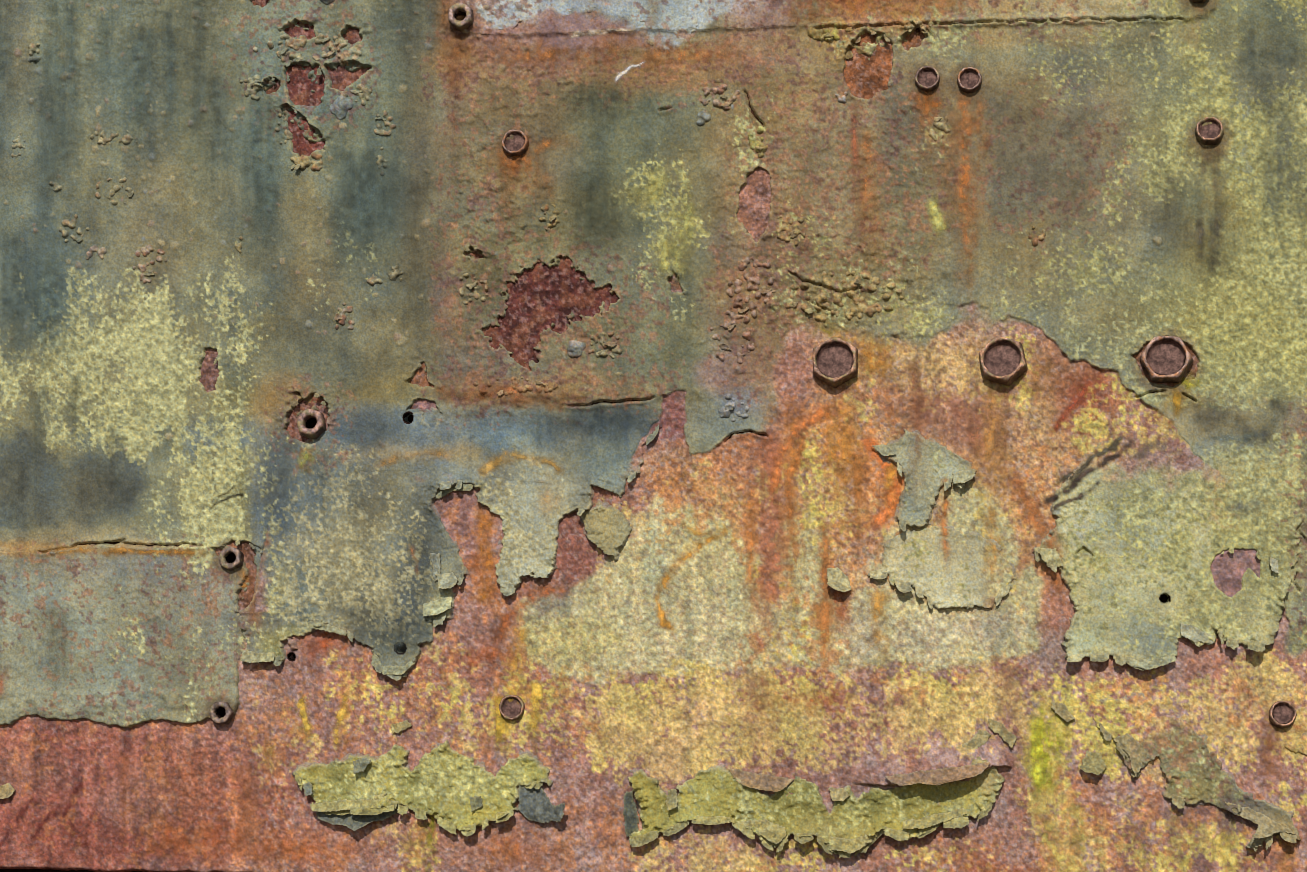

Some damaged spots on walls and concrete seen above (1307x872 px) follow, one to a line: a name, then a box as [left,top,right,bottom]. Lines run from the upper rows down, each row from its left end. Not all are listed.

corrosion [844,28,928,100]
peeling [239,419,662,681]
corrosion [480,453,561,474]
corrosion [658,528,718,629]
corrosion [746,409,902,598]
corrosion [820,526,847,654]
peeling [827,567,851,592]
peeling [867,429,1016,611]
peeling [1033,415,1307,671]
peeling [292,720,565,837]
peeling [623,719,1017,858]
peeling [1080,692,1301,852]